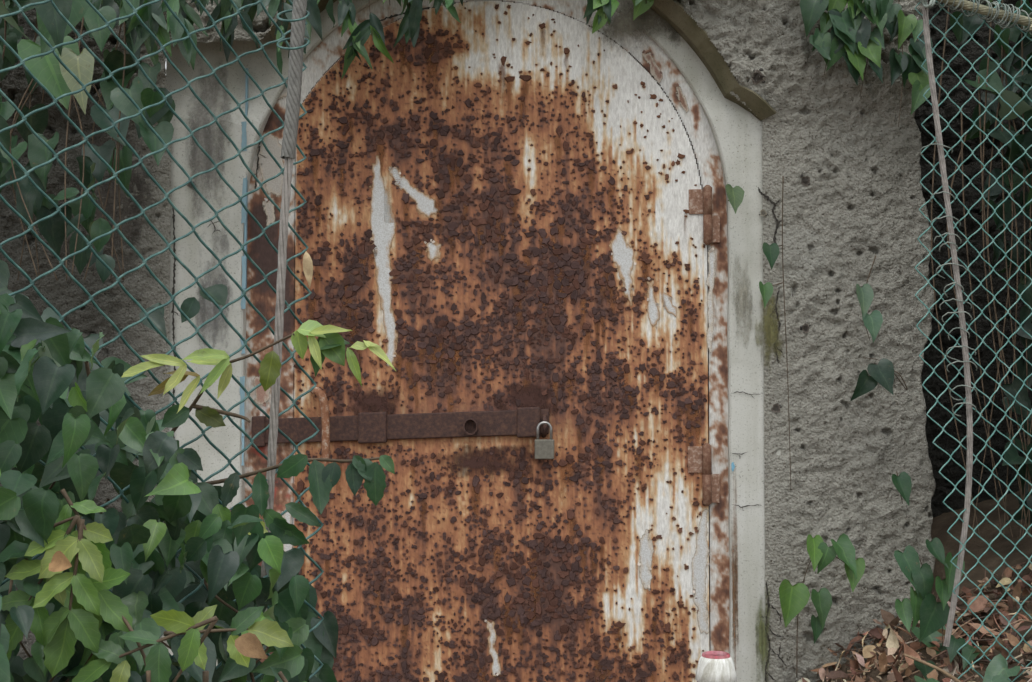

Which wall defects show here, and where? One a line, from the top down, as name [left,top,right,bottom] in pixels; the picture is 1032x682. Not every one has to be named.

rust [293,14,708,682]